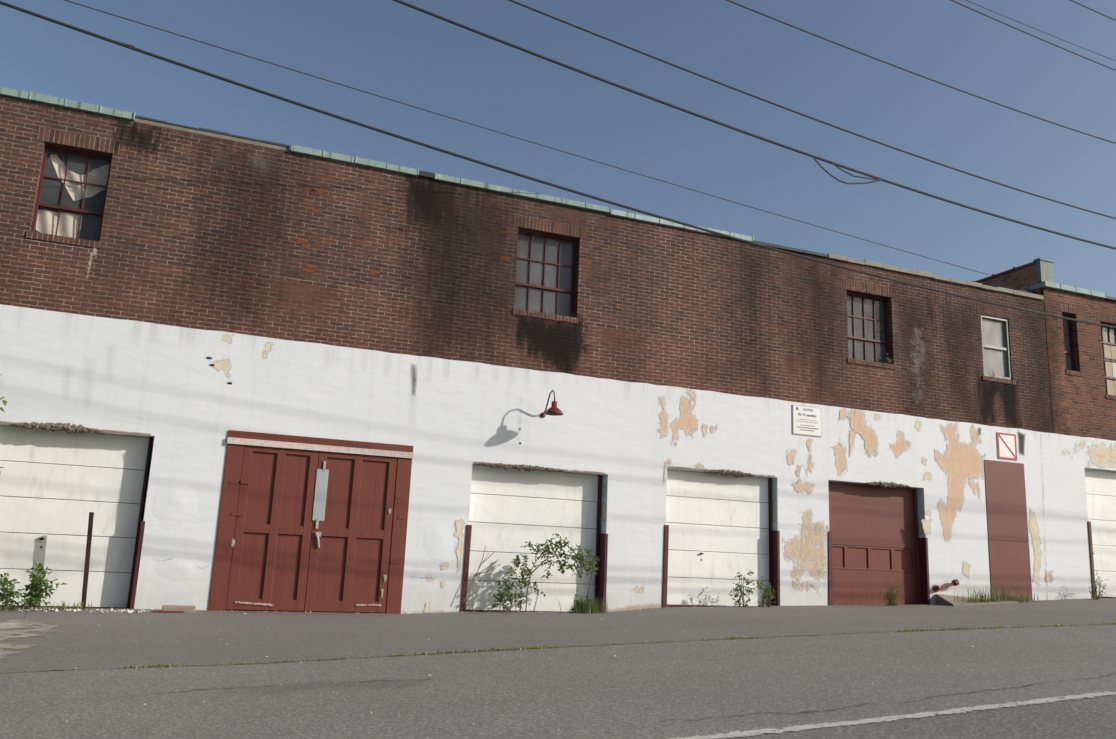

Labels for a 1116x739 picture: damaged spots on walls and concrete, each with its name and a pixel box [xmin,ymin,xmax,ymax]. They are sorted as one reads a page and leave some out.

damp [114,122,161,152]
damp [517,315,586,374]
peeling [658,384,717,445]
spalling [663,459,777,522]
peeling [787,439,816,494]
peeling [831,408,922,477]
spalling [866,481,911,489]
peeling [919,422,986,542]
damp [979,375,1025,455]
peeling [1062,439,1116,468]
peeling [426,519,465,588]
peeling [782,509,829,593]